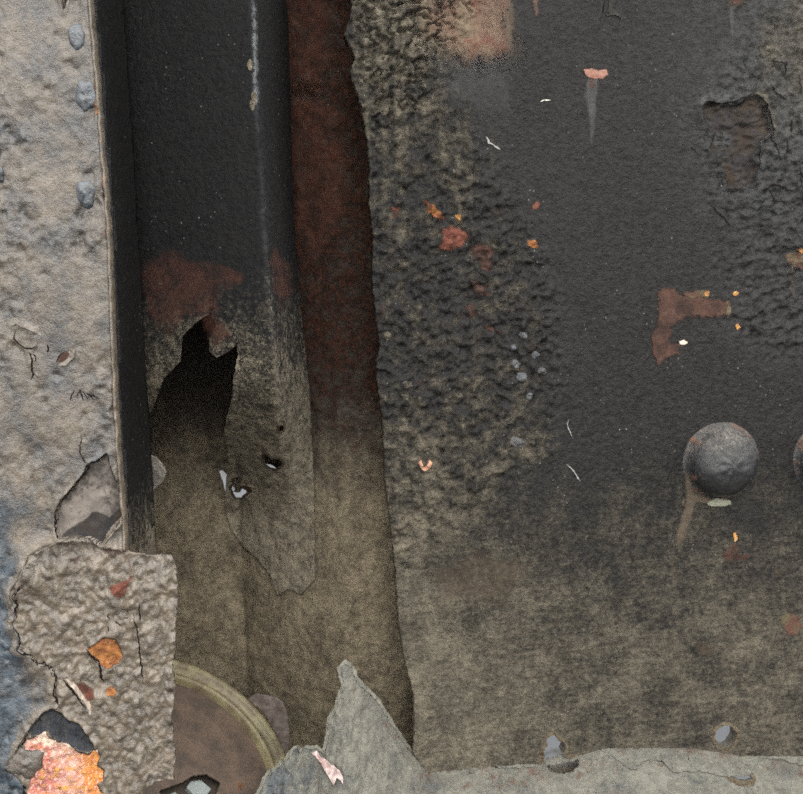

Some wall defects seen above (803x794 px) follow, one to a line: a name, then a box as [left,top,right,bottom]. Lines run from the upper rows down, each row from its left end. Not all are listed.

corrosion [424,200,493,271]
crack [9,318,49,379]
corrosion [651,288,731,365]
crack [70,390,97,400]
spalling [15,438,128,591]
crack [4,566,60,774]
peeling [64,679,94,715]
corrosion [7,731,103,794]
spalling [28,710,94,752]